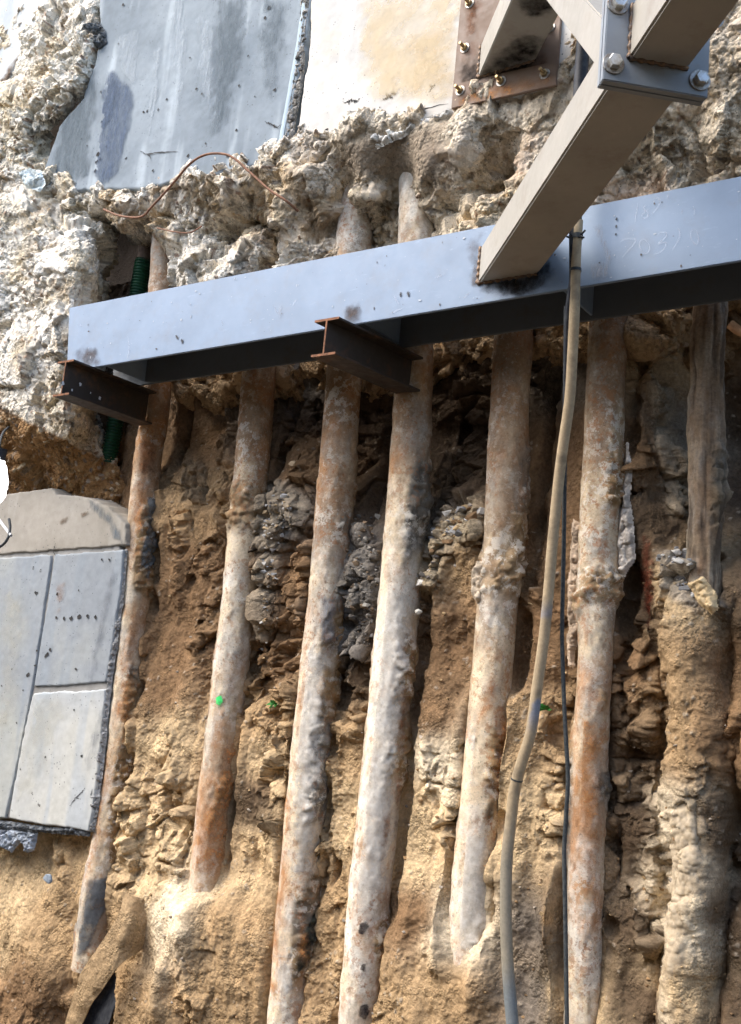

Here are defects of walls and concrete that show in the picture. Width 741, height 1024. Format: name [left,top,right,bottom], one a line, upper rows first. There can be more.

damp [49,39,135,184]
spalling [591,0,741,206]
spalling [0,0,576,504]
spalling [577,321,589,364]
spalling [623,306,694,363]
rust [196,748,235,869]
rust [581,722,598,838]